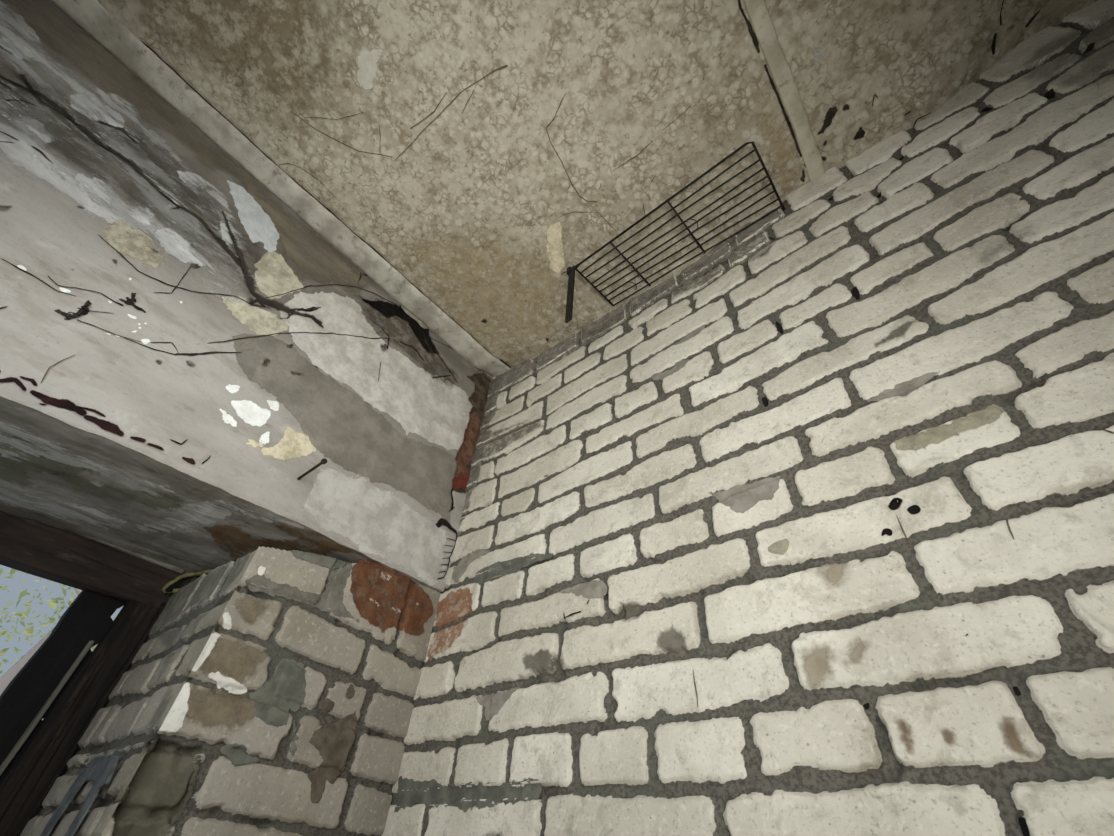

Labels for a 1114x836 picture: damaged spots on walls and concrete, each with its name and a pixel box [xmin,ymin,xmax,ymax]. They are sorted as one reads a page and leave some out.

crack [738,0,802,157]
flaking render [0,1,492,523]
crack [0,40,511,382]
damp [0,421,304,533]
corrosion [203,523,472,661]